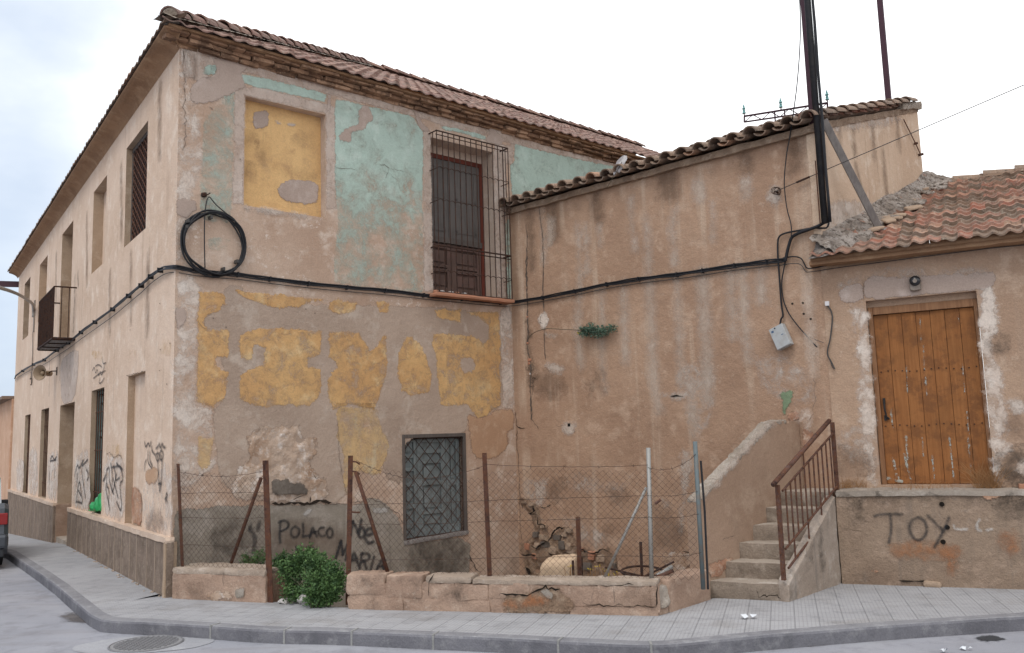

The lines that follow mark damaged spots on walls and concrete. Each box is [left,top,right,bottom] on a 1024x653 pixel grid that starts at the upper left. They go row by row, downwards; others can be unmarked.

peeling [176,97,231,212]
peeling [241,74,424,280]
peeling [442,126,486,139]
peeling [510,144,614,195]
peeling [159,219,515,487]
flaking render [231,424,329,504]
spalling [501,497,617,614]